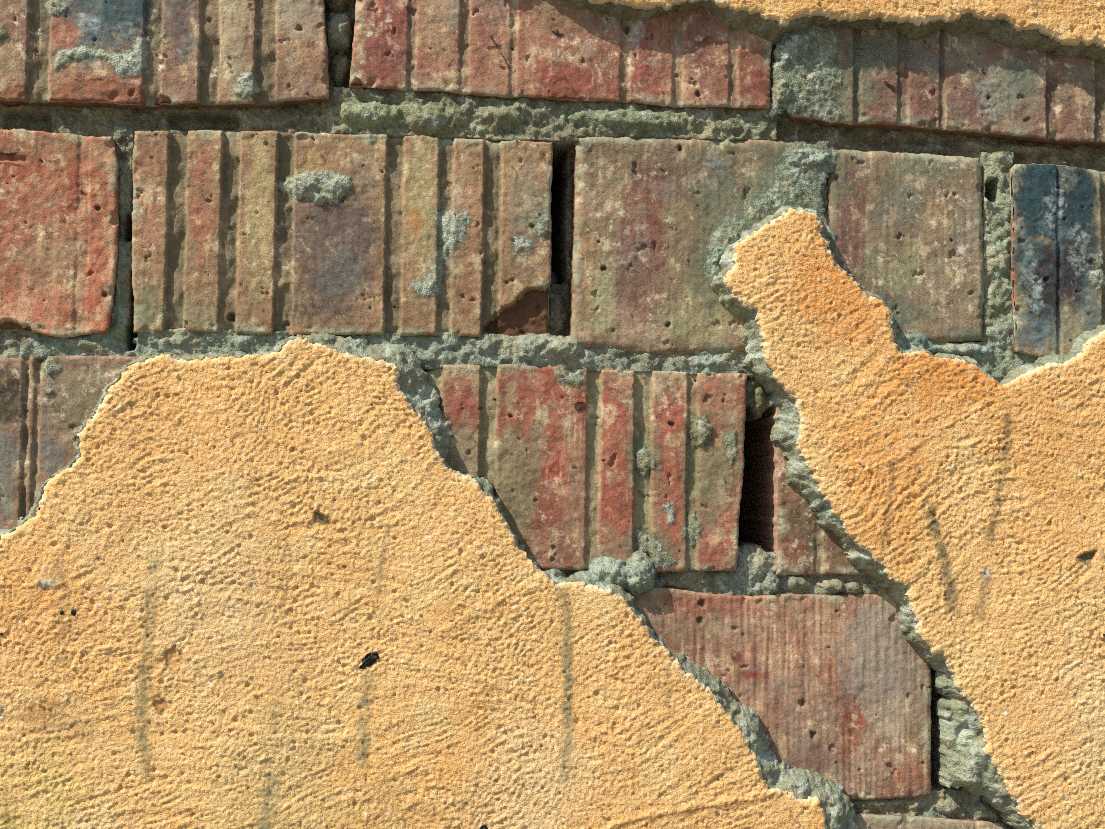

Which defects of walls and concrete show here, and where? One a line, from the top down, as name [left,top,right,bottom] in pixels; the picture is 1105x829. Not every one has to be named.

peeling [772,33,806,104]
spalling [0,85,30,101]
spalling [50,78,171,106]
peeling [786,147,832,167]
peeling [534,210,549,236]
peeling [709,226,740,267]
spalling [484,288,549,336]
spalling [0,321,33,332]
peeling [632,444,656,478]
spalling [315,512,330,524]
peeling [663,501,701,547]
spalling [1075,552,1095,565]